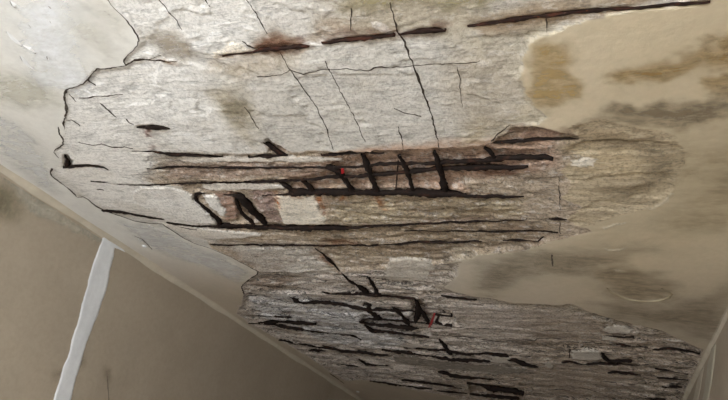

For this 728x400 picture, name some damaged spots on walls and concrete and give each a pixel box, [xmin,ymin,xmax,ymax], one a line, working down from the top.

crack [257,2,479,150]
spalling [51,0,710,229]
leakage [529,46,581,105]
leakage [610,102,728,125]
leakage [613,49,728,80]
spalling [132,119,703,400]